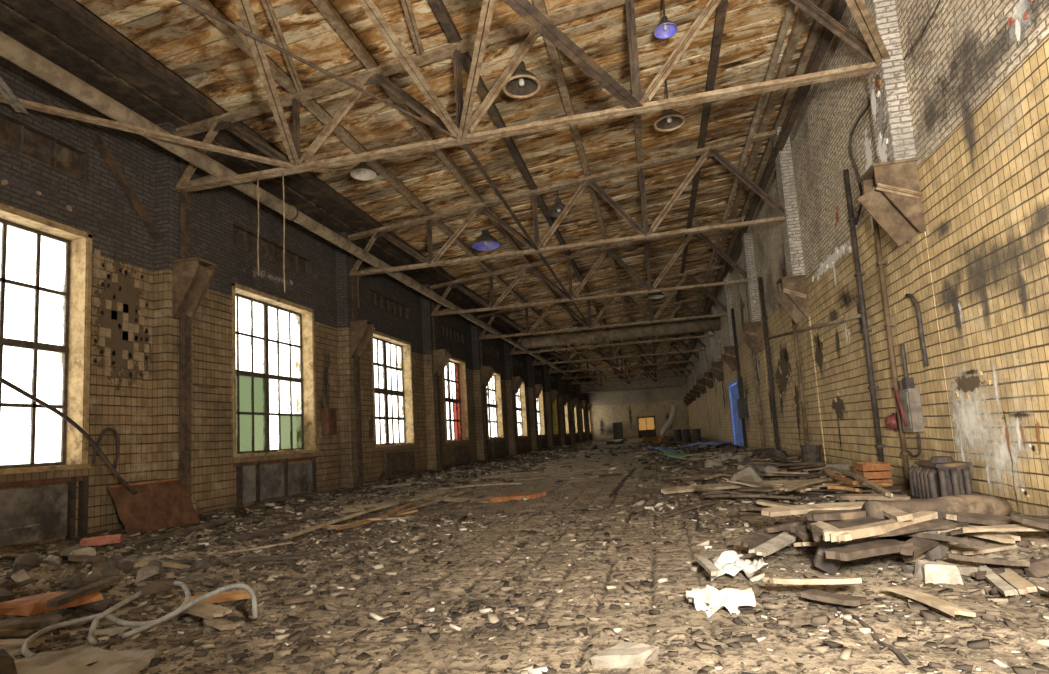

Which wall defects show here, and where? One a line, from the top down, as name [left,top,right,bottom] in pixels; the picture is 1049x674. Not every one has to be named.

peeling [1006,0,1034,44]
damp [964,102,974,153]
spalling [91,249,152,391]
damp [953,295,962,334]
damp [981,285,989,326]
damp [1018,272,1027,311]
spalling [954,370,991,399]